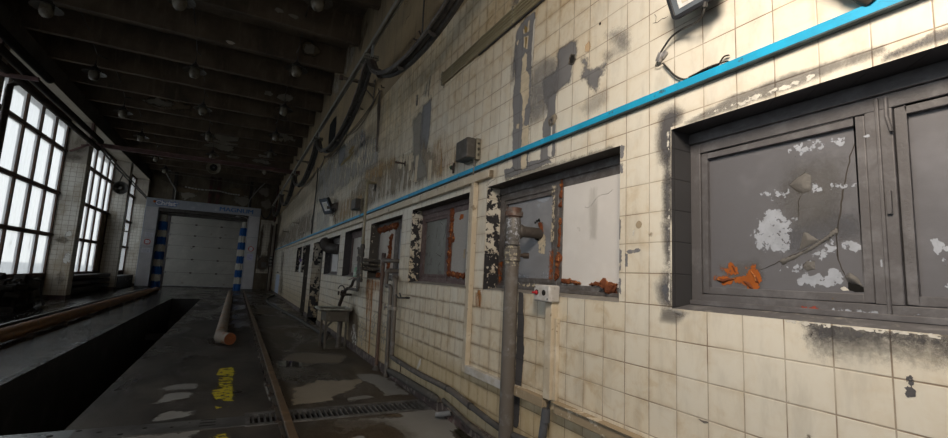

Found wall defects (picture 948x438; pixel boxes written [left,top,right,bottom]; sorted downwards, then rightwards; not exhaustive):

peeling [516,19,536,147]
peeling [295,232,331,317]
peeling [408,210,423,282]
peeling [483,188,501,289]
rust [714,262,762,289]
peeling [750,189,798,253]
peeling [779,239,878,313]
peeling [812,183,857,193]